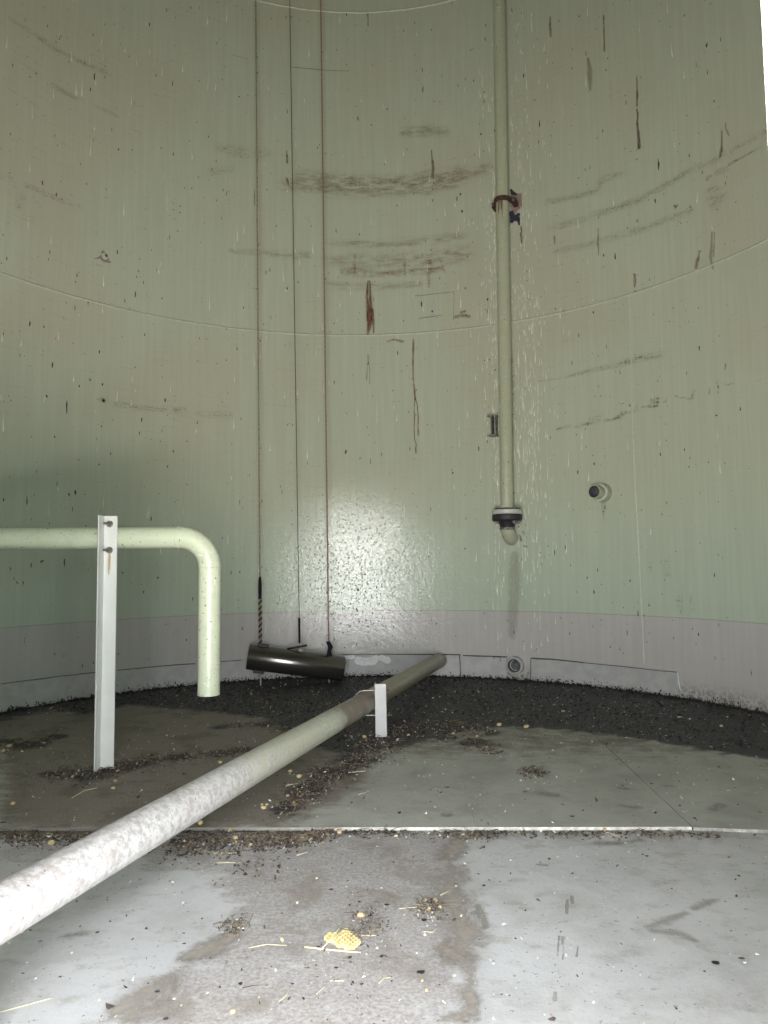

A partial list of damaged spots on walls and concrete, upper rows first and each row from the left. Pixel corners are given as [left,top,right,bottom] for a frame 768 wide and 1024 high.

corrosion [366,281,374,334]
corrosion [387,339,419,452]